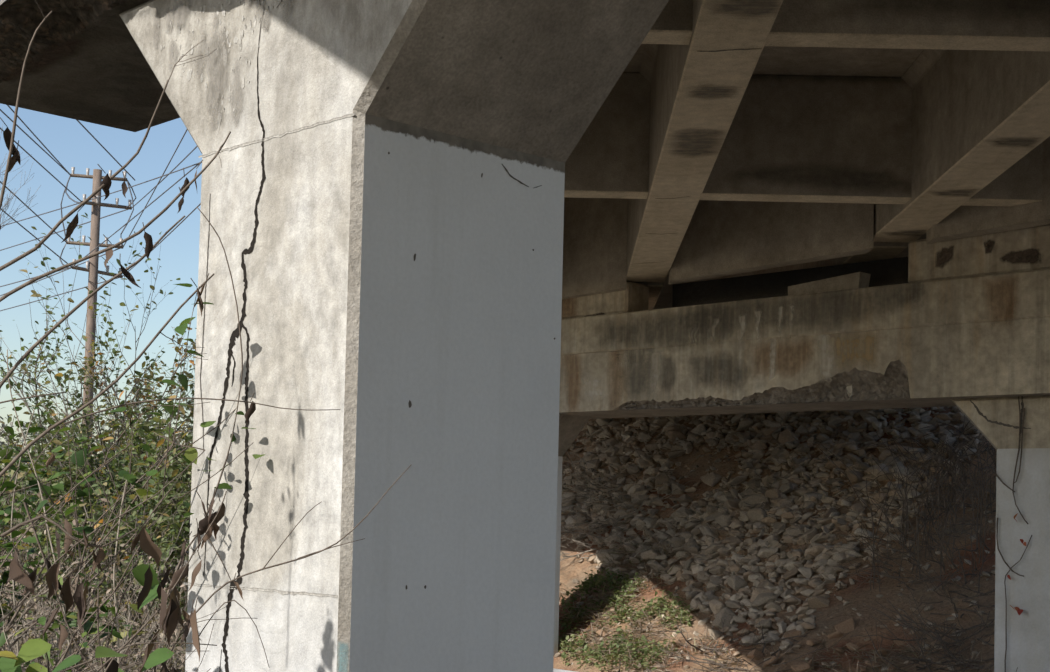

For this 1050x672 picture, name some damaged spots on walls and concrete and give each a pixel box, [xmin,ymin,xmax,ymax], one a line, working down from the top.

spalling [0,0,115,83]
crack [200,0,282,672]
water stain [605,286,920,393]